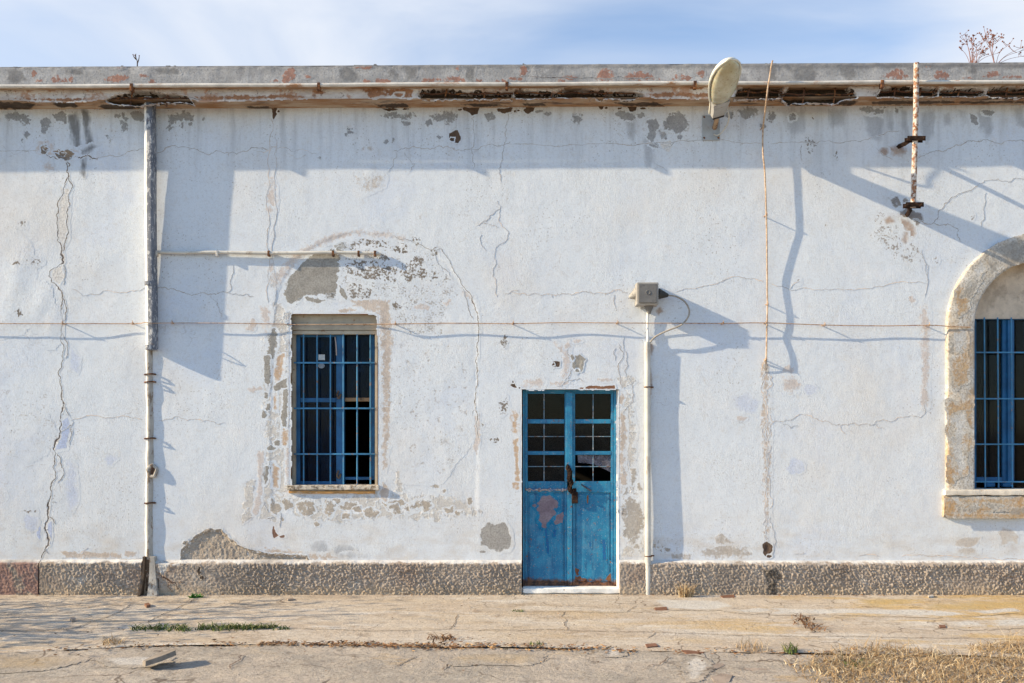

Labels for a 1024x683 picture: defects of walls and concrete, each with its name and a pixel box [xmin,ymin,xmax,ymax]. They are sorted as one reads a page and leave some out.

damp [0,100,140,179]
peeling [343,88,695,155]
rust [877,143,911,159]
crack [388,114,1024,436]
peeling [867,205,941,272]
peeling [958,234,1024,299]
crack [0,119,278,631]
peeling [155,225,804,581]
crack [760,365,926,555]
peeling [22,508,139,560]
rust [575,560,611,582]
crack [859,552,1024,560]